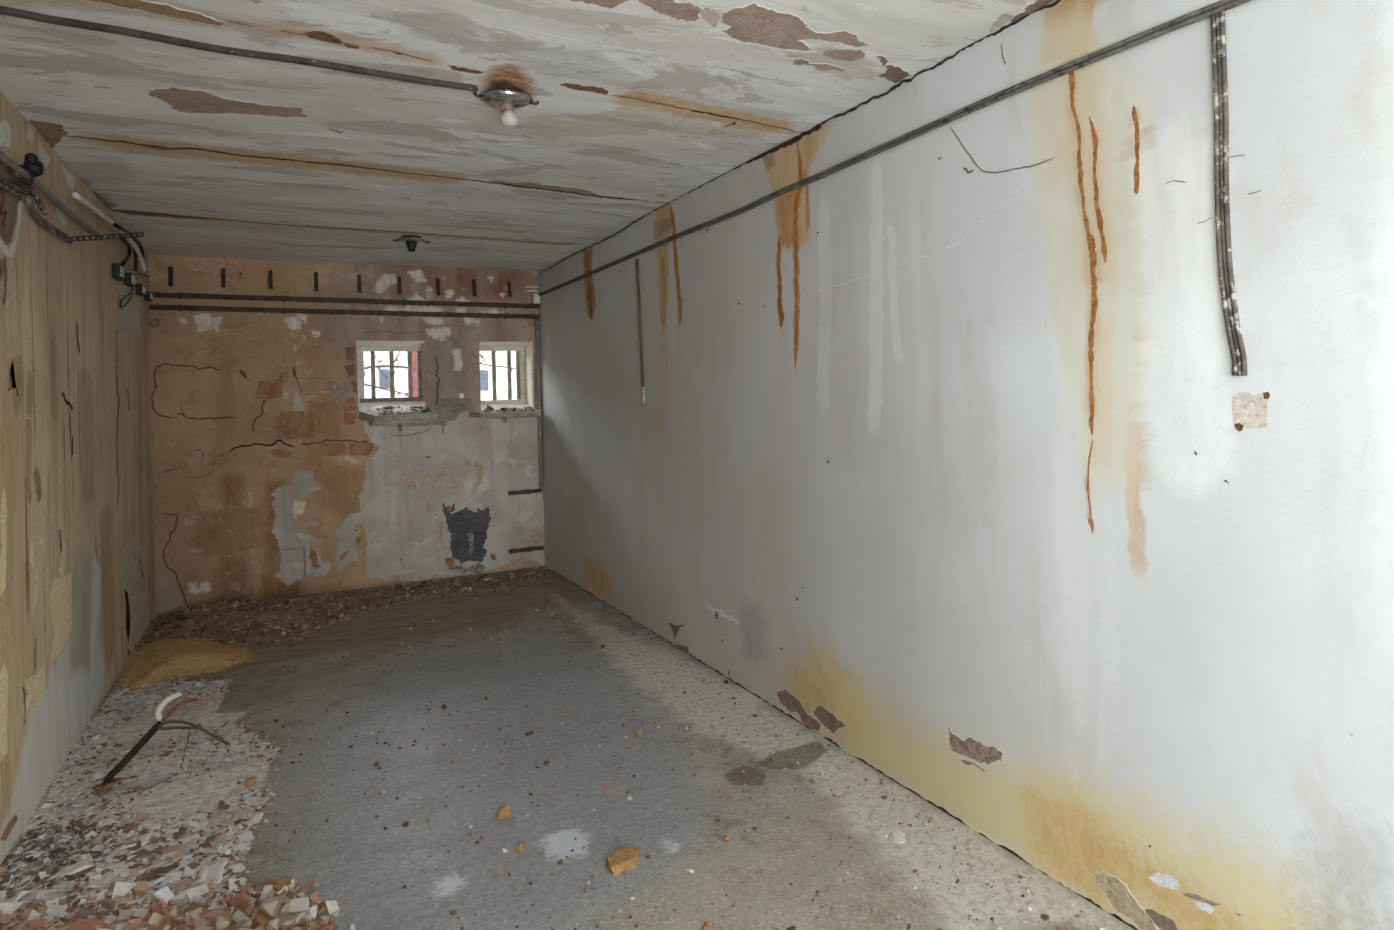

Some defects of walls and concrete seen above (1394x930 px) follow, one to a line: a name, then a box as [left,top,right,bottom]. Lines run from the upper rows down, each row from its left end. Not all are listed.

peeling [570,0,913,84]
corrosion [1132,106,1140,194]
corrosion [652,201,683,446]
corrosion [758,118,837,370]
corrosion [1069,61,1107,535]
crack [62,392,73,455]
crack [116,330,368,505]
peeling [270,268,545,585]
crack [163,513,189,608]
peeling [948,726,1003,772]
leakage [768,614,1394,930]
peeling [1148,872,1220,914]